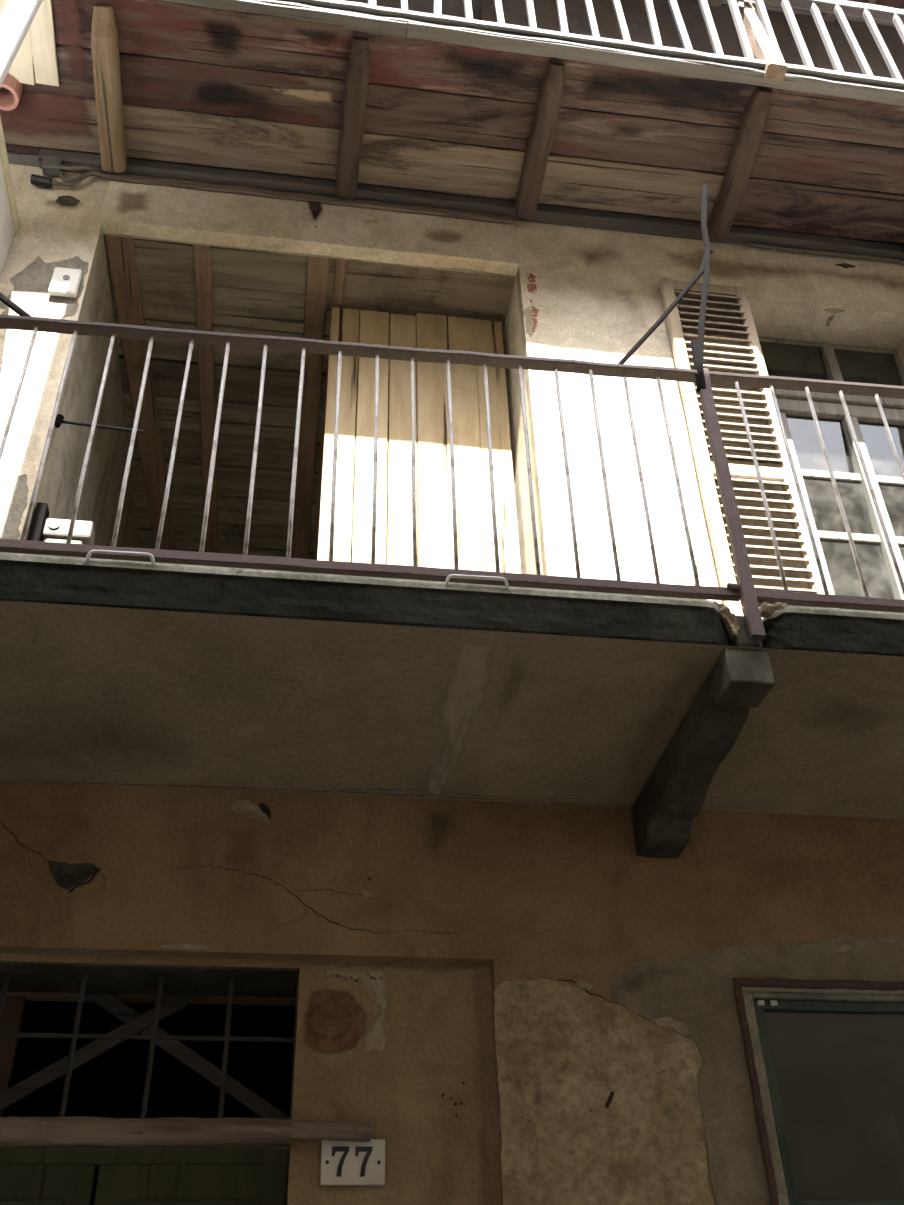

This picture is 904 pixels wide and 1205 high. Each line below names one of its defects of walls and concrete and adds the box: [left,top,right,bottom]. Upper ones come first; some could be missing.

peeling [2,299,21,315]
spalling [713,601,763,648]
damp [427,643,494,795]
crack [0,779,594,805]
crack [172,865,468,935]
peeling [494,978,714,1205]